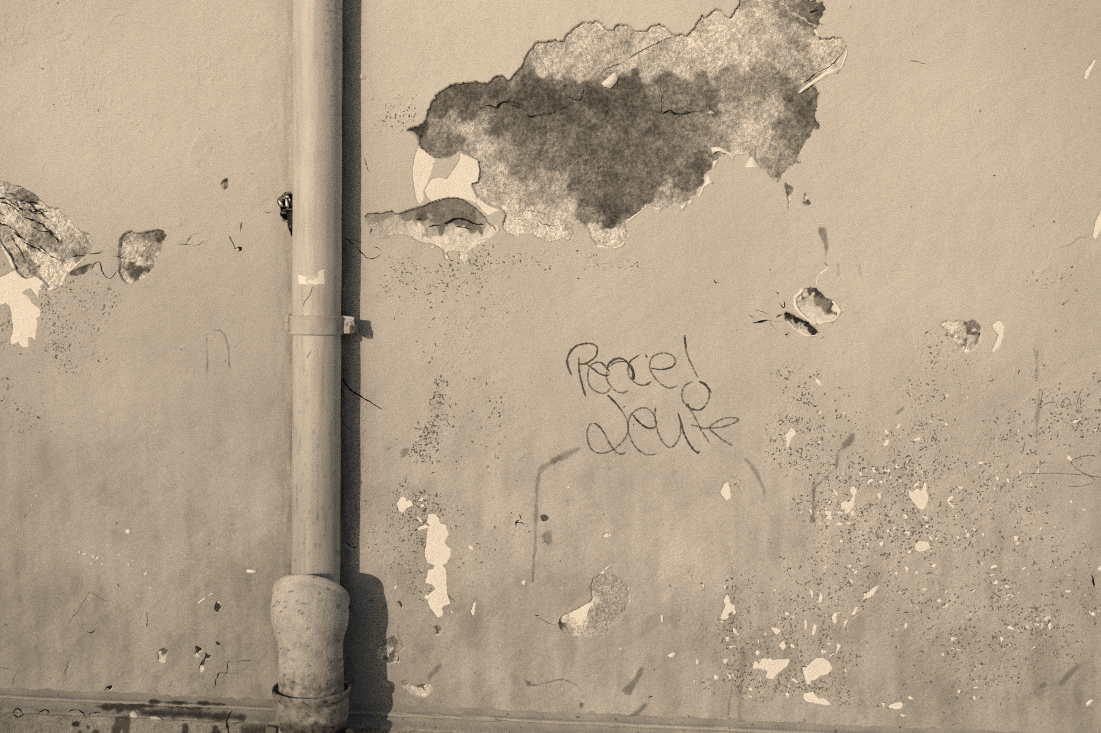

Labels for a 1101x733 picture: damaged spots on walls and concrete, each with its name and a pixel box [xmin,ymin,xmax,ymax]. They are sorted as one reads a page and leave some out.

flaking render [364,0,849,266]
flaking render [0,180,93,347]
flaking render [117,228,167,284]
flaking render [783,287,842,337]
flaking render [941,319,1004,355]
peeling [809,483,939,575]
peeling [417,514,451,636]
flaking render [558,566,631,639]
peeling [721,585,735,620]
peeling [832,585,879,628]
peeling [753,612,816,681]
peeling [802,643,842,705]